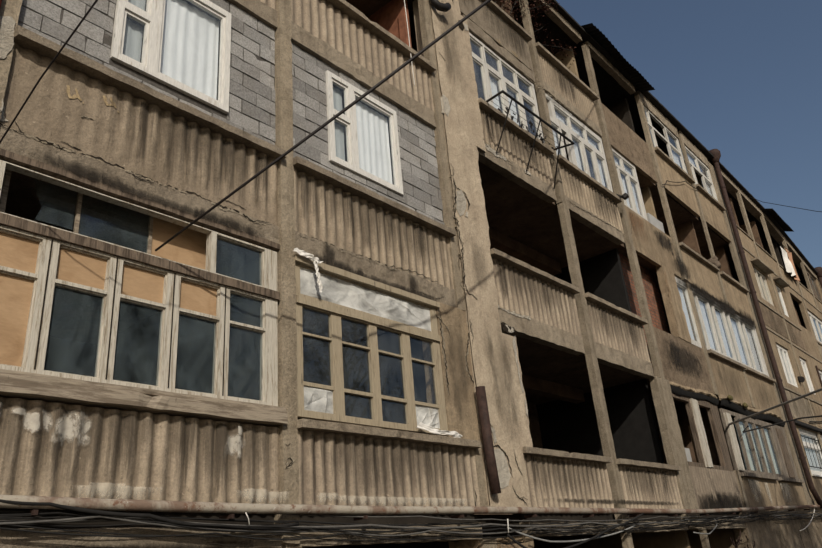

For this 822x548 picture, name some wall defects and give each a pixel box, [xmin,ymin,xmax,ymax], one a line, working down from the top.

damp [45,155,123,187]
crack [0,118,274,225]
damp [195,208,254,234]
crack [449,165,477,299]
crack [434,309,475,396]
damp [667,343,701,376]
peeling [14,408,49,431]
peeling [59,416,90,440]
peeling [228,426,242,454]
crack [512,453,528,505]